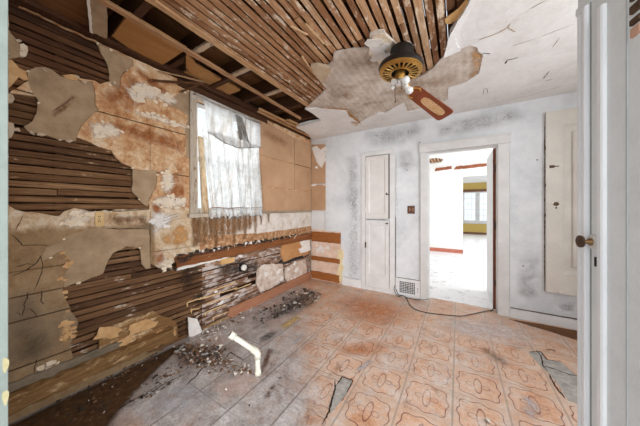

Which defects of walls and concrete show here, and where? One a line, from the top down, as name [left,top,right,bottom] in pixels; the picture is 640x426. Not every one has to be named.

flaking render [158,0,483,135]
flaking render [8,1,344,355]
crack [13,245,48,317]
spalling [322,376,353,425]
spalling [529,350,577,403]